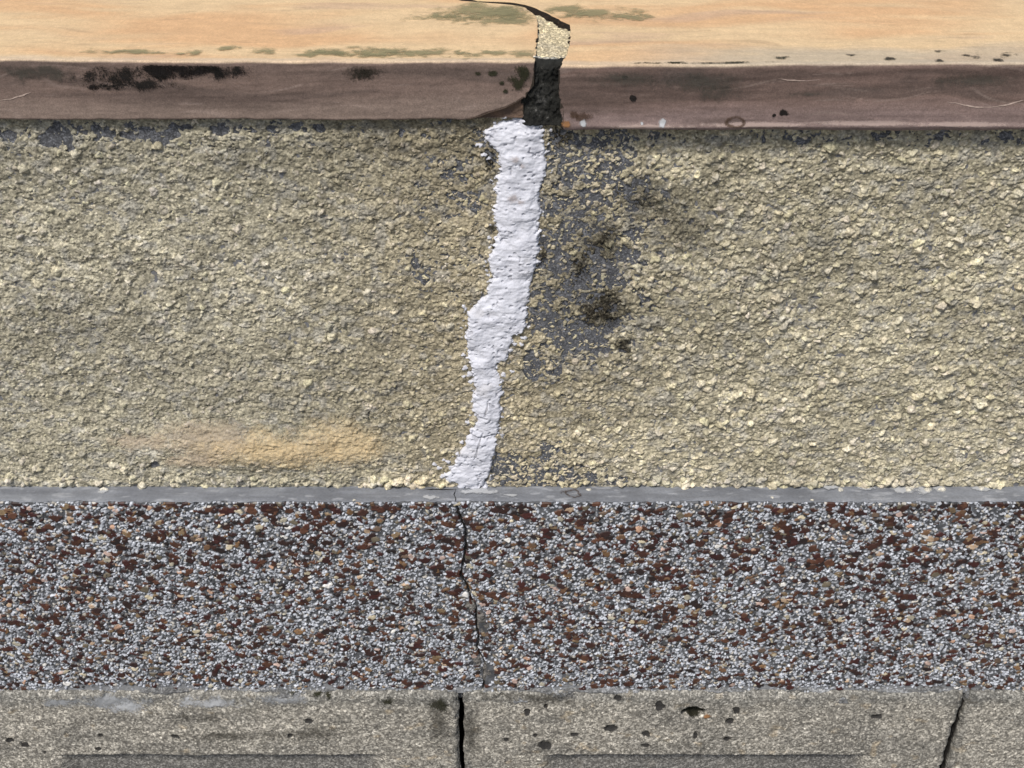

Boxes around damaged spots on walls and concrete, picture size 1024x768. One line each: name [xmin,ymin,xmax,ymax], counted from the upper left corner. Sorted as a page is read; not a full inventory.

crack [515,5,571,43]
leakage [11,65,245,92]
leakage [567,230,620,285]
leakage [580,288,625,325]
crack [425,489,486,687]